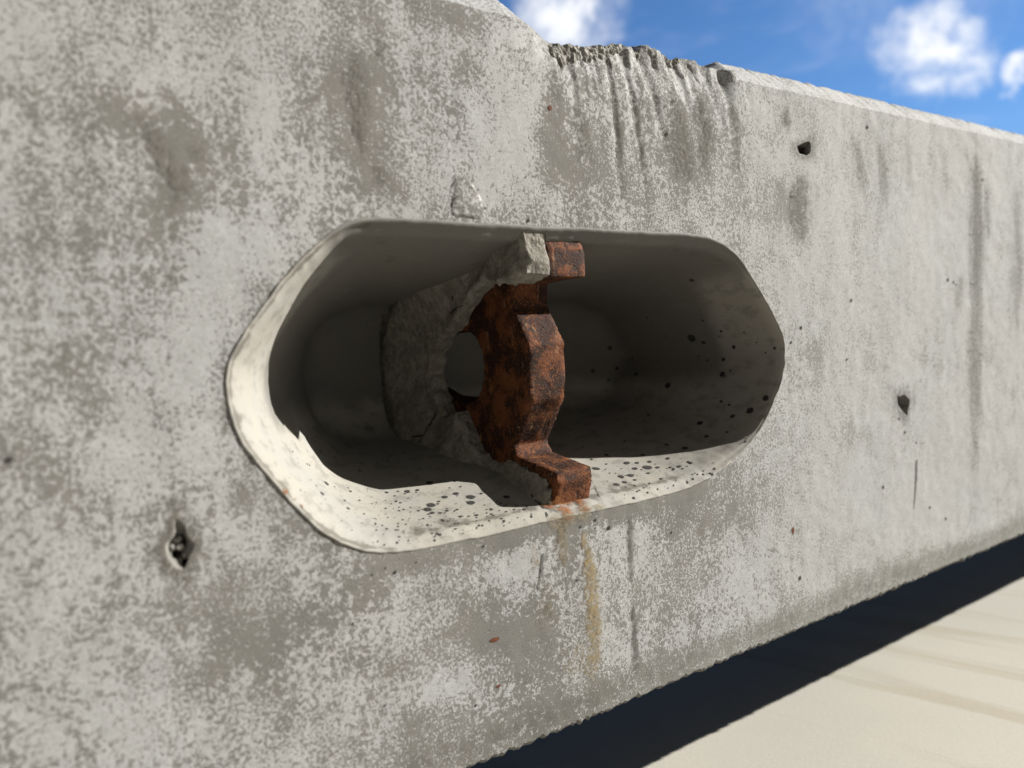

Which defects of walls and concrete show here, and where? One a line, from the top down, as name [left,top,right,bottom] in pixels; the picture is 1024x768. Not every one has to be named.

spalling [545,40,709,103]
spalling [721,70,738,87]
spalling [340,468,533,546]
corrosion [544,496,589,563]
corrosion [582,537,601,662]